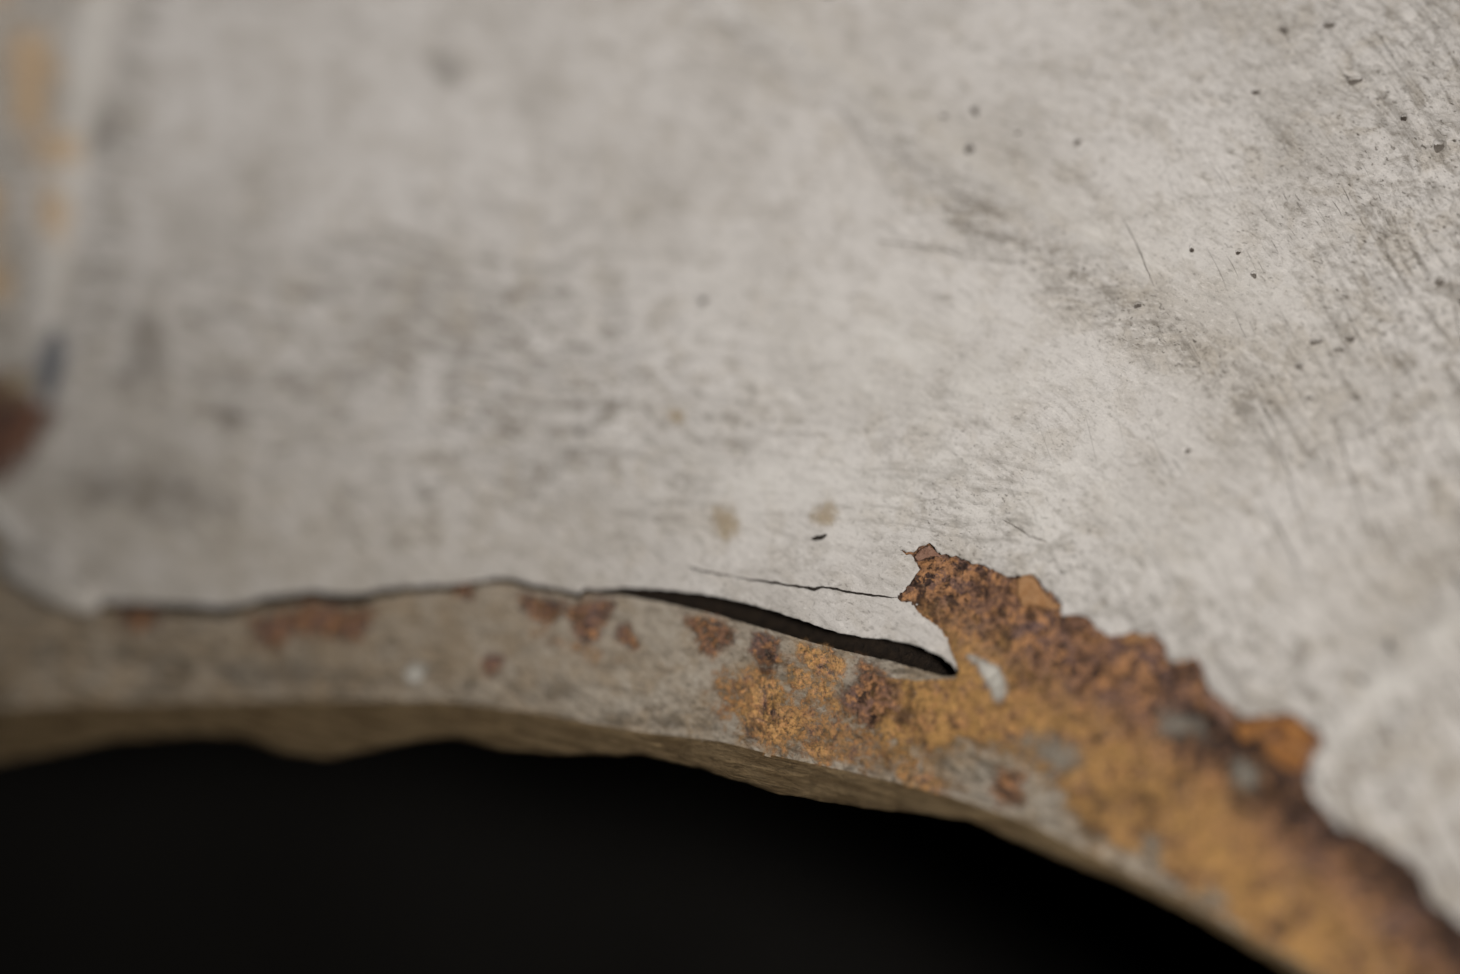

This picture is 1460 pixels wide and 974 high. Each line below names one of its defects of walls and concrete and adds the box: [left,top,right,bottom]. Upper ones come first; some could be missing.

crack [98,567,959,676]
rust [518,593,639,650]
rust [684,616,950,794]
rust [989,769,1025,806]
peeling [861,543,1460,974]